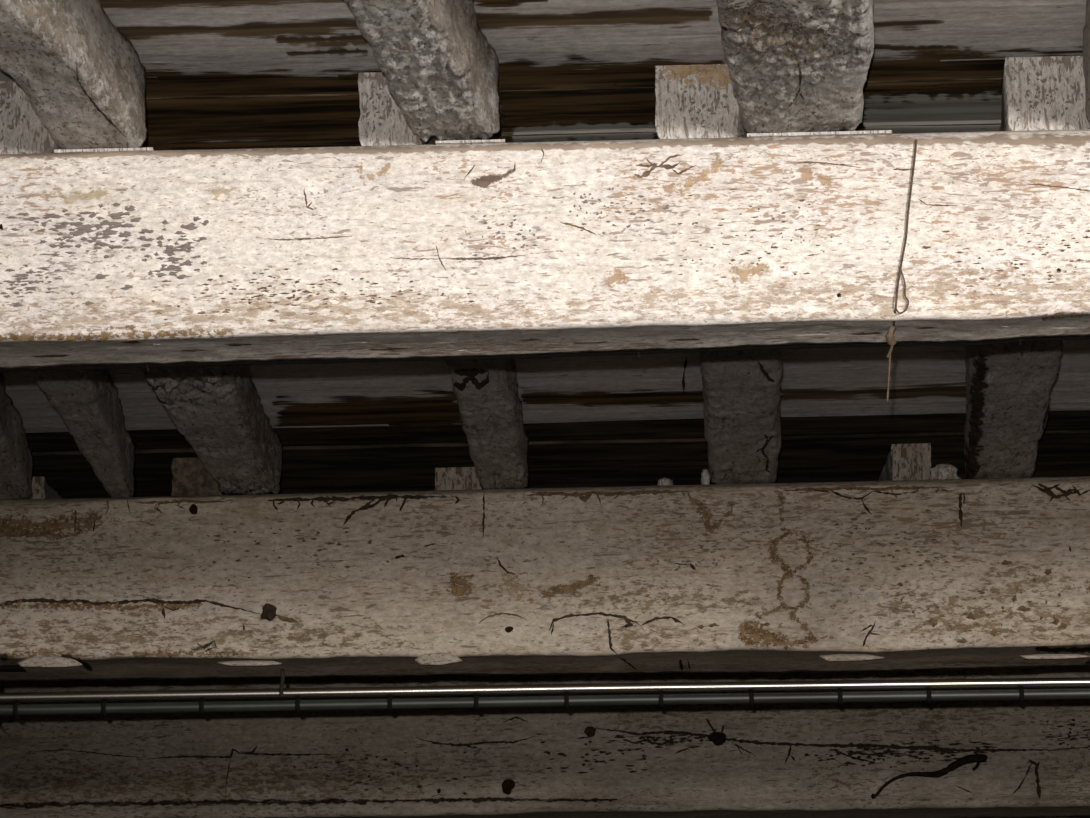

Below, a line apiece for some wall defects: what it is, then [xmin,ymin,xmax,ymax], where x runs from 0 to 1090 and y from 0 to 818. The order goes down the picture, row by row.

crack [919,198,958,206]
crack [268,494,485,536]
crack [0,598,297,630]
crack [479,612,685,670]
crack [595,718,1090,799]